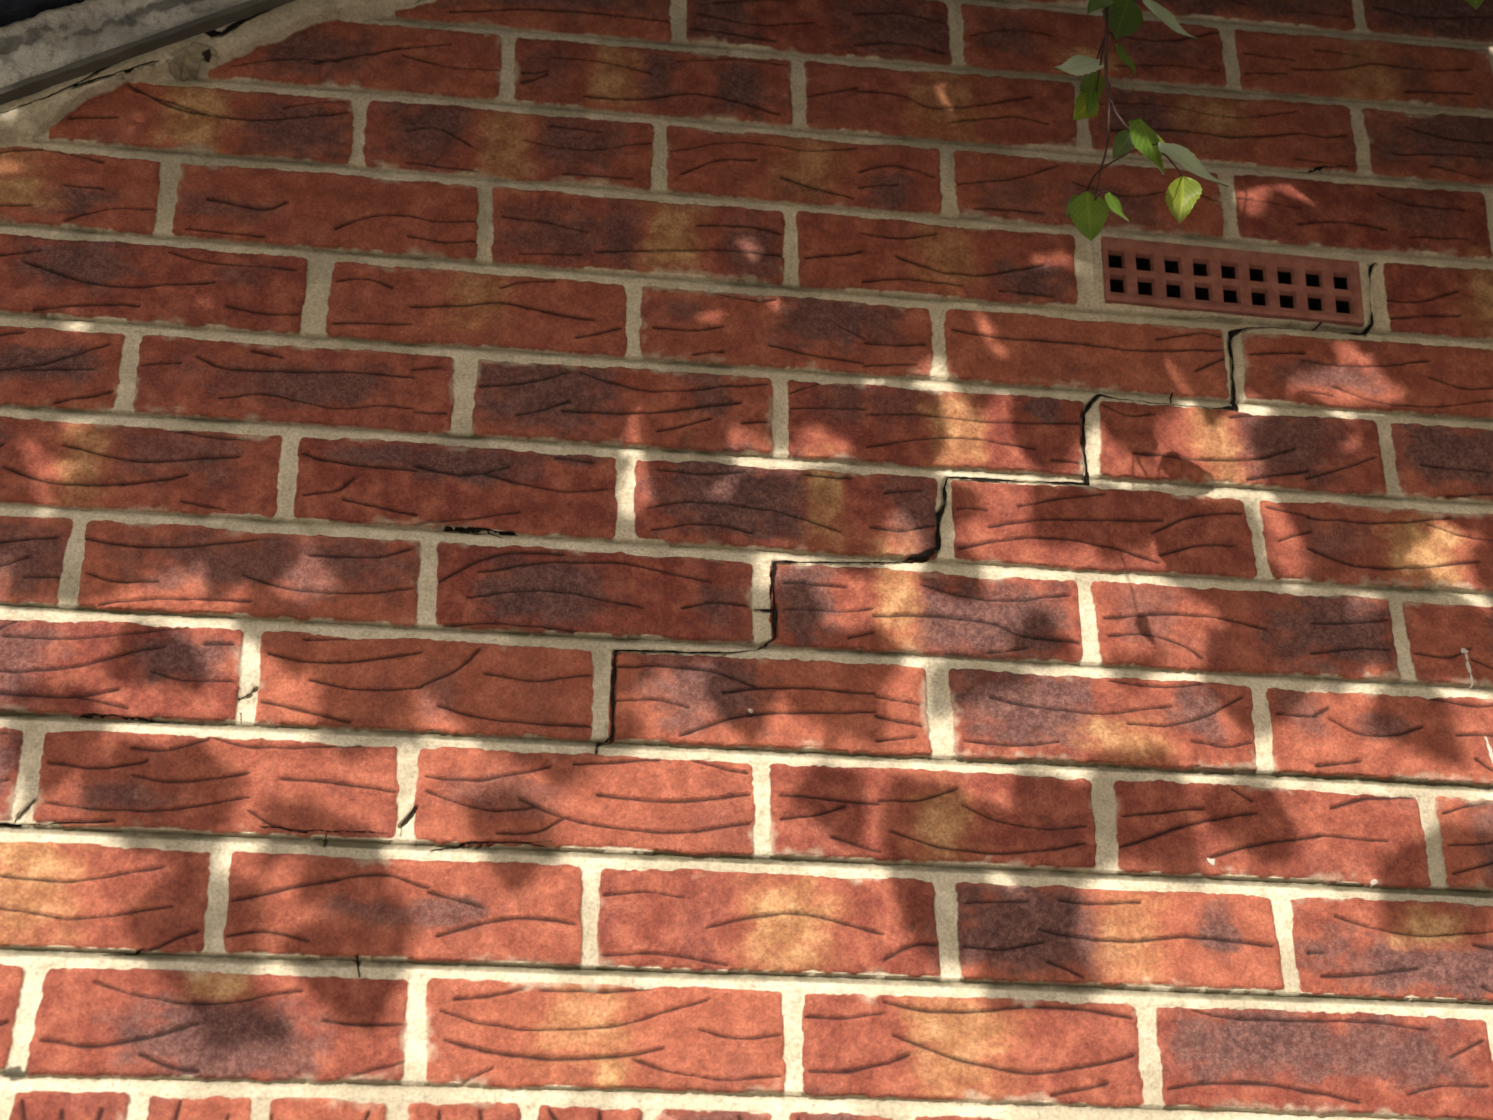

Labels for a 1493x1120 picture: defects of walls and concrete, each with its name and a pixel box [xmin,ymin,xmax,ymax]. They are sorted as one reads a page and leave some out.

crack [595,262,1376,753]